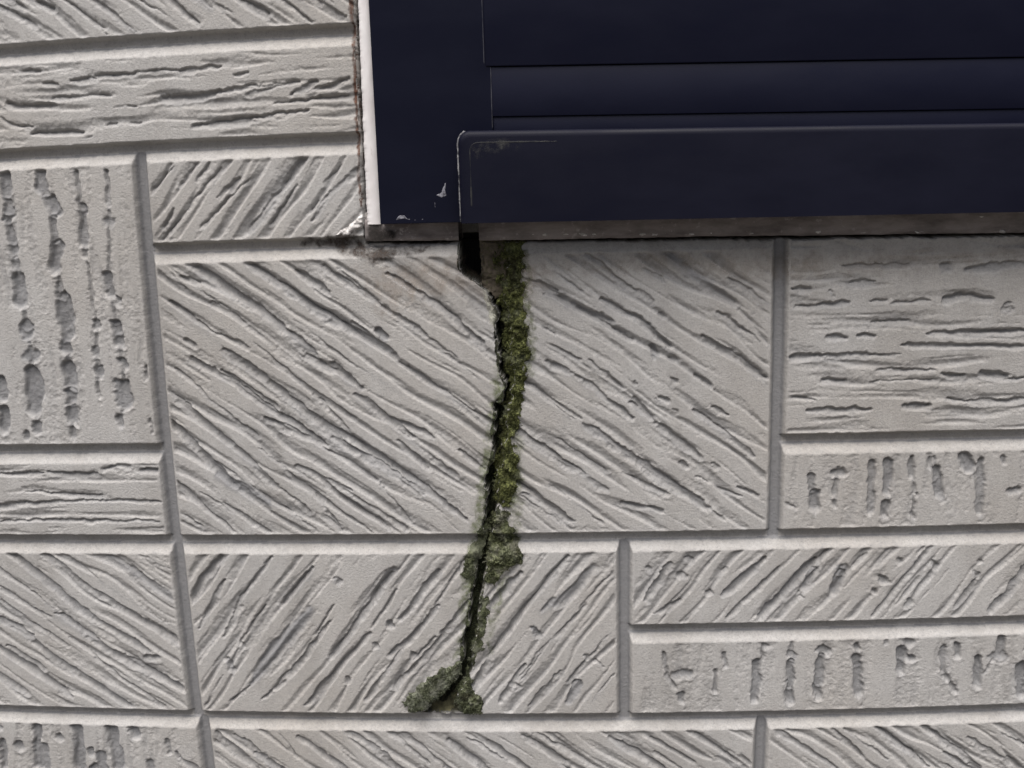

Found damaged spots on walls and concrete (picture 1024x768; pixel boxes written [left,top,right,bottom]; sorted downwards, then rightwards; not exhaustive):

crack [401,233,532,716]